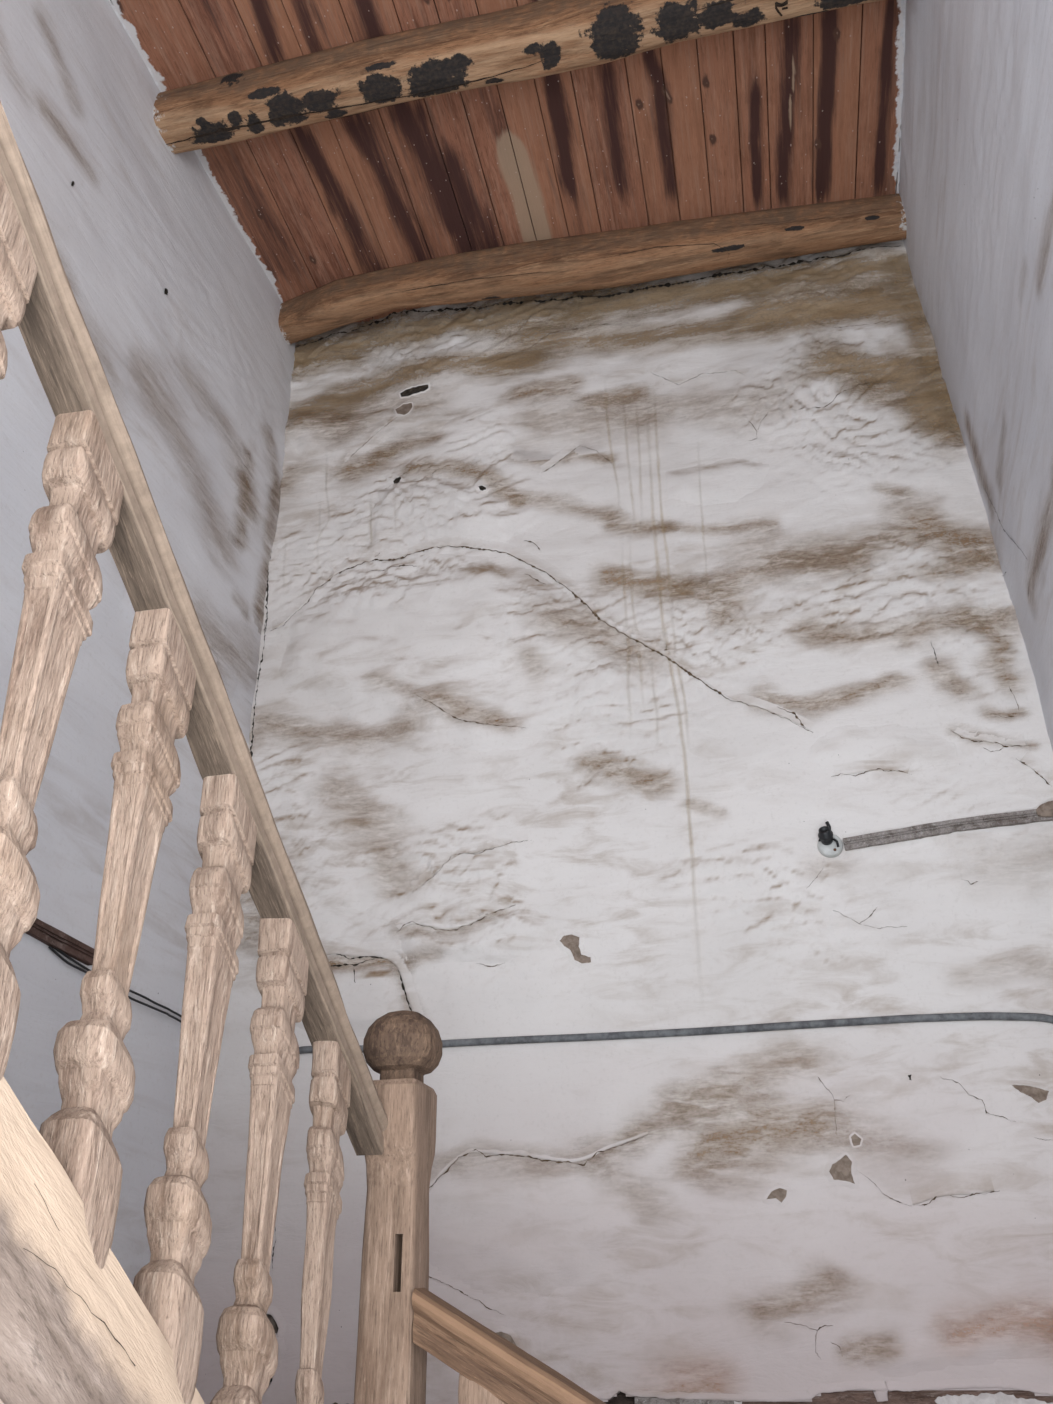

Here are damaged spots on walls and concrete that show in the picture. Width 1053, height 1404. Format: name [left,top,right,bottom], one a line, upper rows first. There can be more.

damp [285,248,980,470]
damp [337,436,525,505]
damp [907,509,999,574]
damp [600,536,890,617]
crack [250,533,817,757]
damp [910,612,1016,681]
damp [762,676,891,710]
crack [832,758,911,777]
flaking render [555,930,596,968]
crack [429,1120,653,1193]
damp [694,1111,834,1172]
flaking render [587,1378,1053,1404]